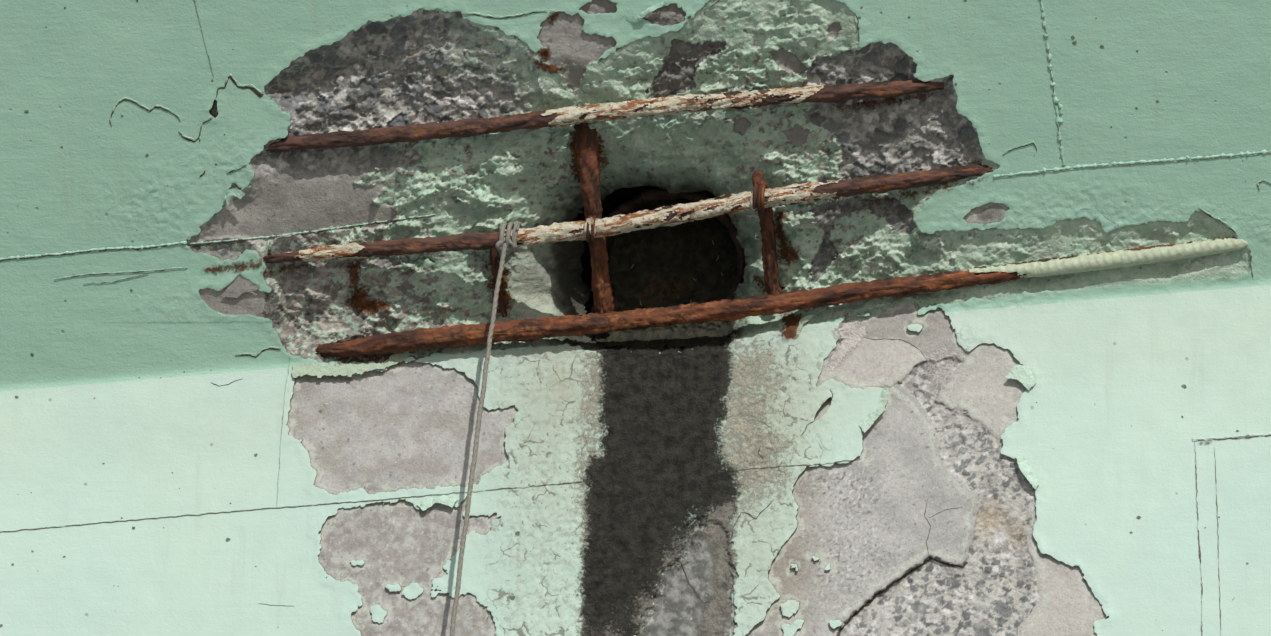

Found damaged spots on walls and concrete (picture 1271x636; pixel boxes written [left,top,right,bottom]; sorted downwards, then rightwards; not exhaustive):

crack [109,74,264,177]
corrosion [569,131,580,183]
corrosion [583,217,596,236]
spalling [187,0,1236,495]
corrosion [774,211,799,266]
corrosion [346,258,390,316]
corrosion [483,250,515,317]
corrosion [324,353,396,365]
corrosion [778,313,802,339]
peeling [638,247,1250,636]
water stain [569,328,796,636]
peeling [318,495,501,636]